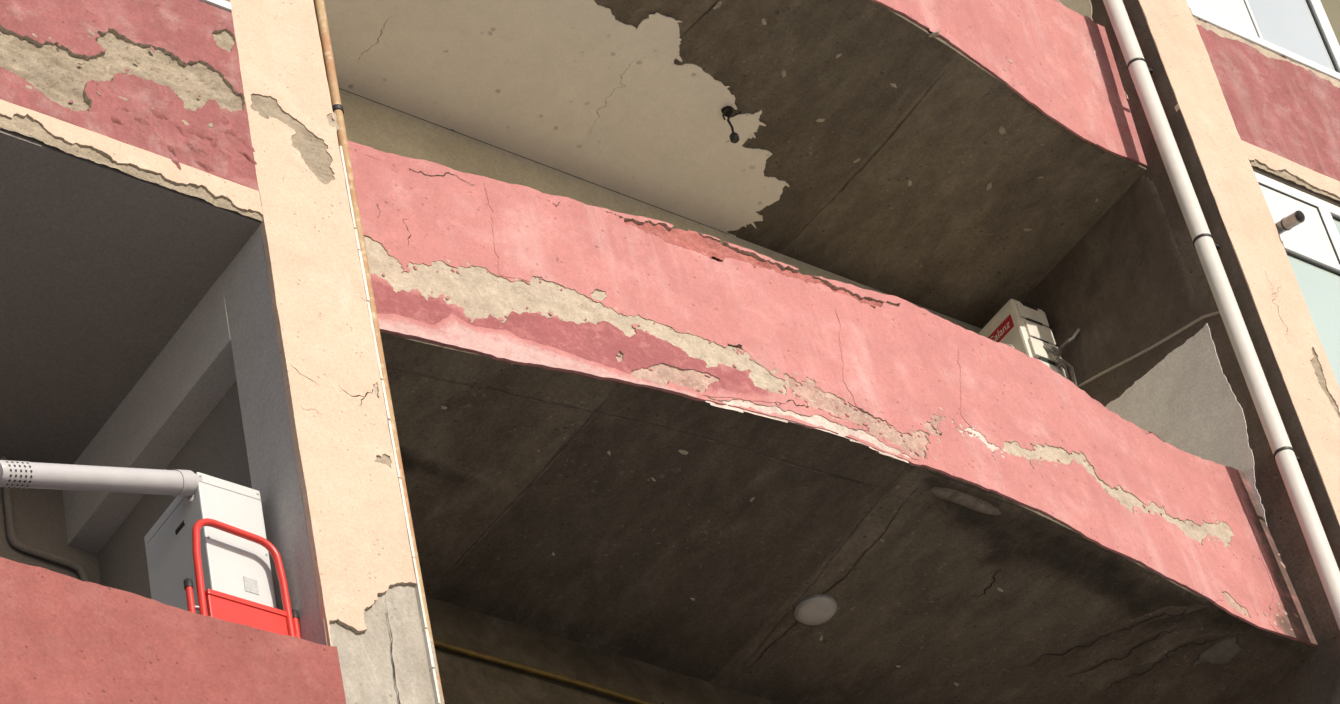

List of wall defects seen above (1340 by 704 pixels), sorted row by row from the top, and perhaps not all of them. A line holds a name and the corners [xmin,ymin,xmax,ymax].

spalling [0,115,262,221]
flaking render [0,29,339,184]
peeling [592,0,1143,328]
flaking render [364,236,1234,547]
flaking render [1311,348,1340,418]
spalling [323,585,443,704]
crack [1022,600,1222,666]